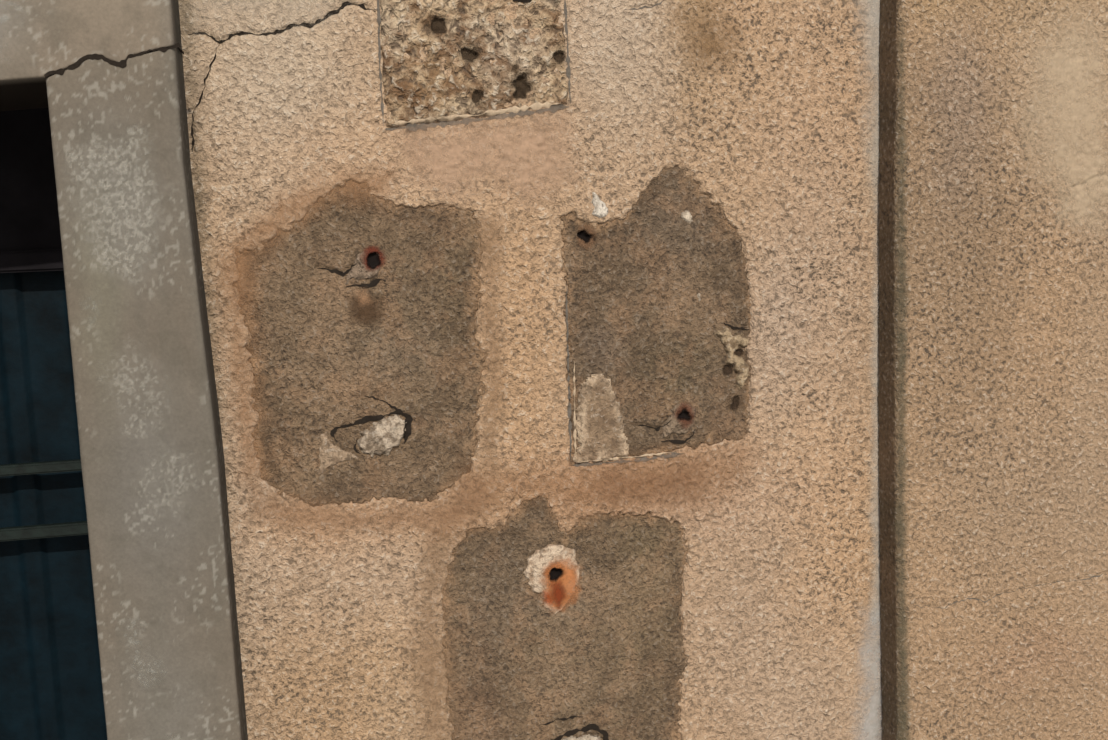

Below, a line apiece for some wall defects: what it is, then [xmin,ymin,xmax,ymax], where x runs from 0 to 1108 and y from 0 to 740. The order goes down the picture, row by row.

crack [44,1,376,152]
spalling [380,0,568,127]
peeling [233,180,487,507]
peeling [560,166,751,466]
corrosion [546,564,576,608]
peeling [441,496,689,740]